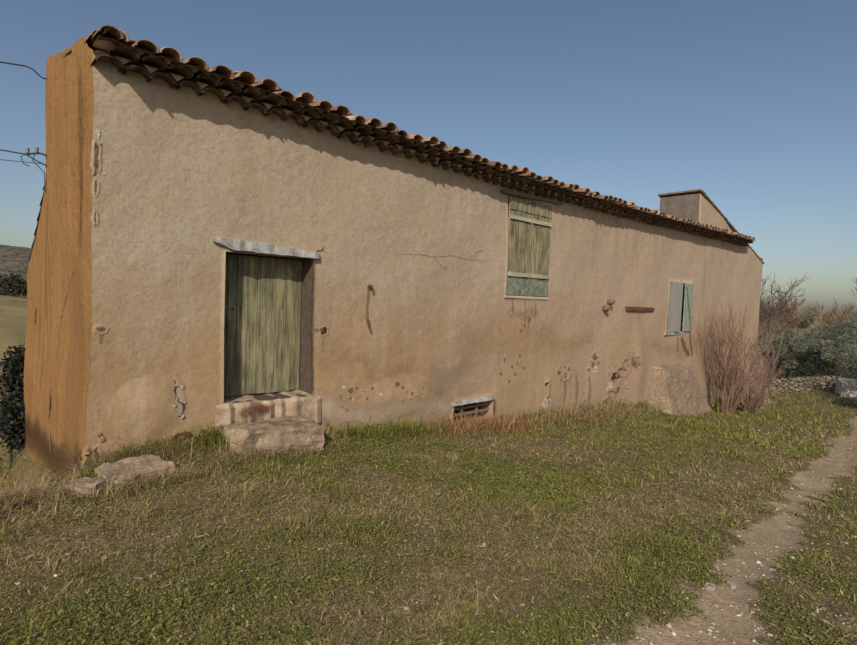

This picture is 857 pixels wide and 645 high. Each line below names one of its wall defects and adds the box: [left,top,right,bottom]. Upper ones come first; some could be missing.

peeling [321,382,452,427]
spalling [582,351,643,405]